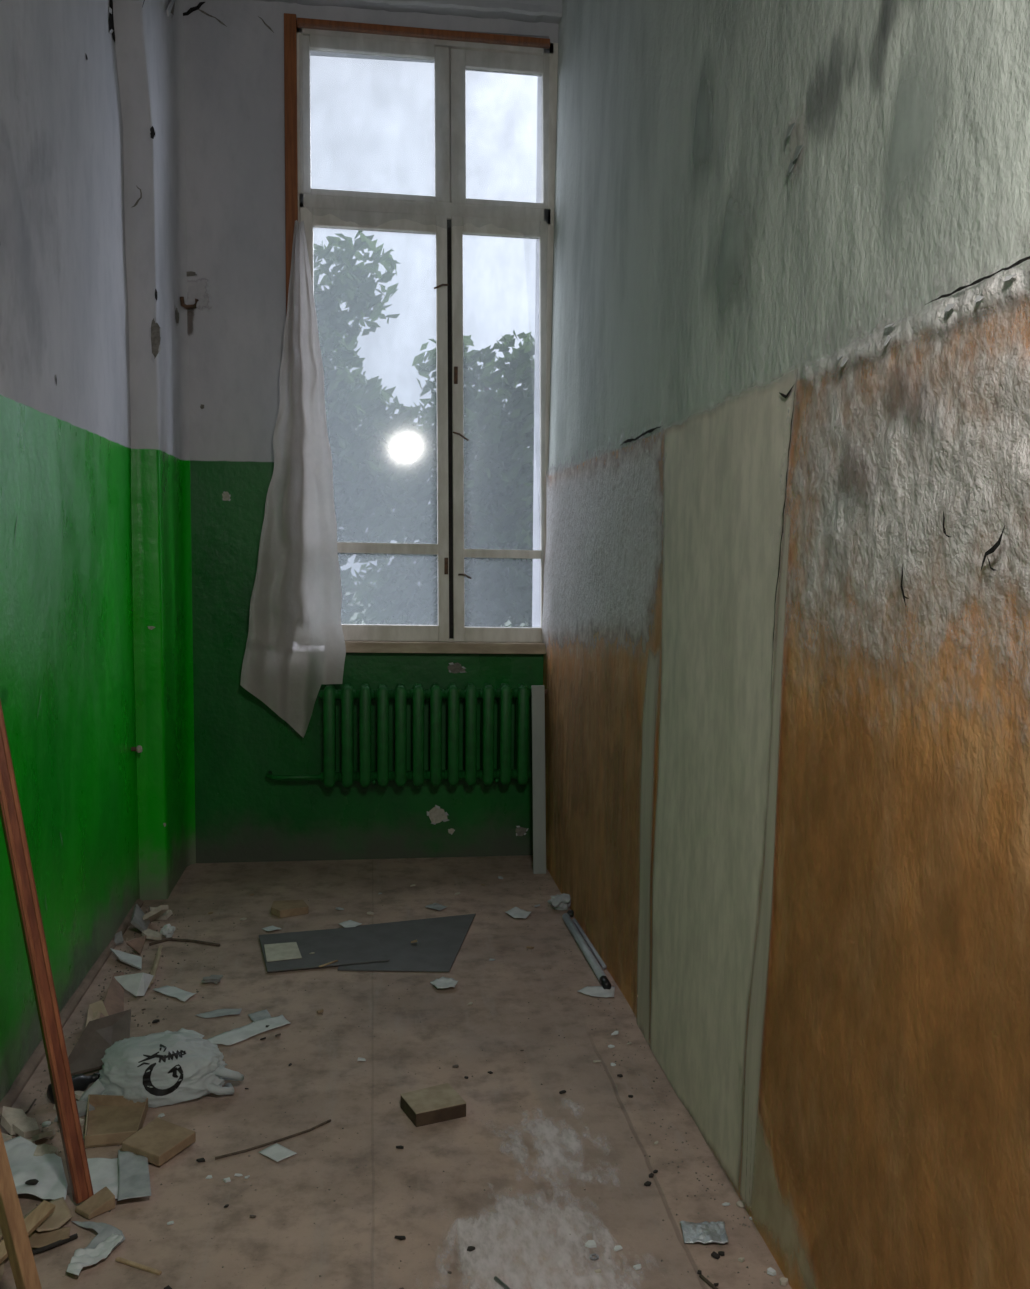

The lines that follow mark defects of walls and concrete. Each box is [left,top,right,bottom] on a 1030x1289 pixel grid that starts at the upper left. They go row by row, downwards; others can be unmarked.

crack [925,256,1030,305]
crack [621,426,661,445]
flaking render [427,805,455,835]